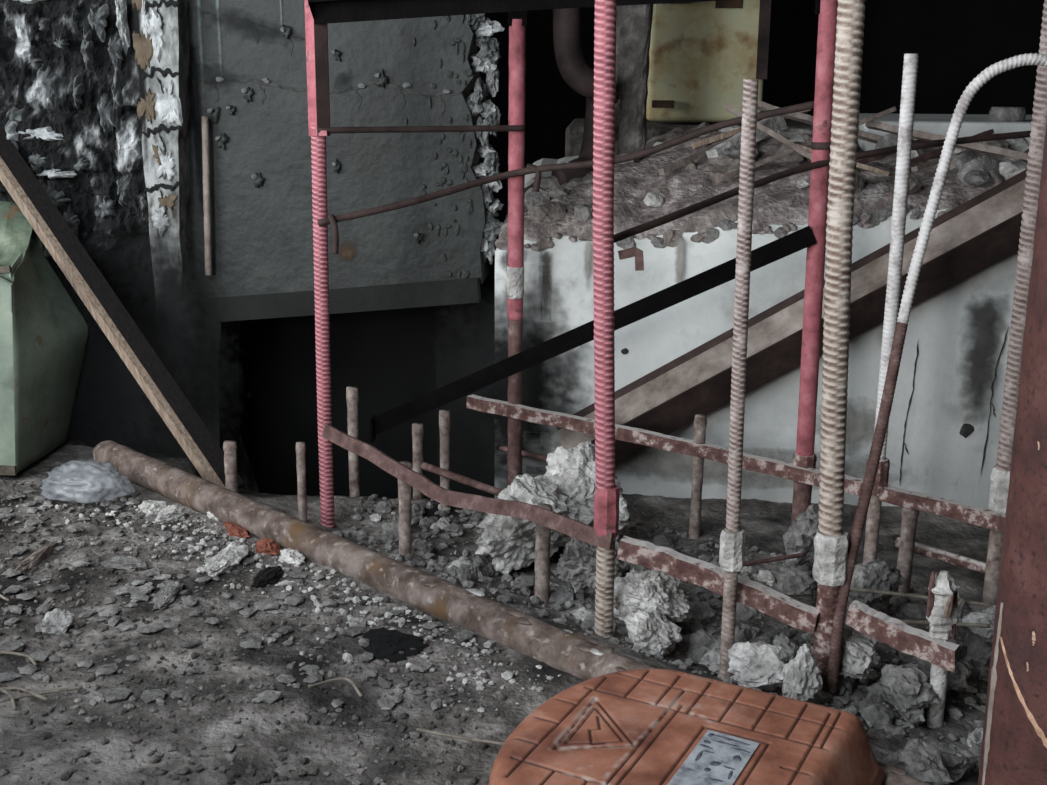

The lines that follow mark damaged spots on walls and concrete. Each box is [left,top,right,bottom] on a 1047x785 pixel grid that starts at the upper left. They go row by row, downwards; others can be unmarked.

spalling [420,13,508,264]
spalling [0,0,183,308]
spalling [524,226,593,252]
spalling [616,219,738,249]
spalling [752,221,798,239]
spalling [853,204,893,228]
spalling [907,203,959,219]
damp [964,299,1001,409]